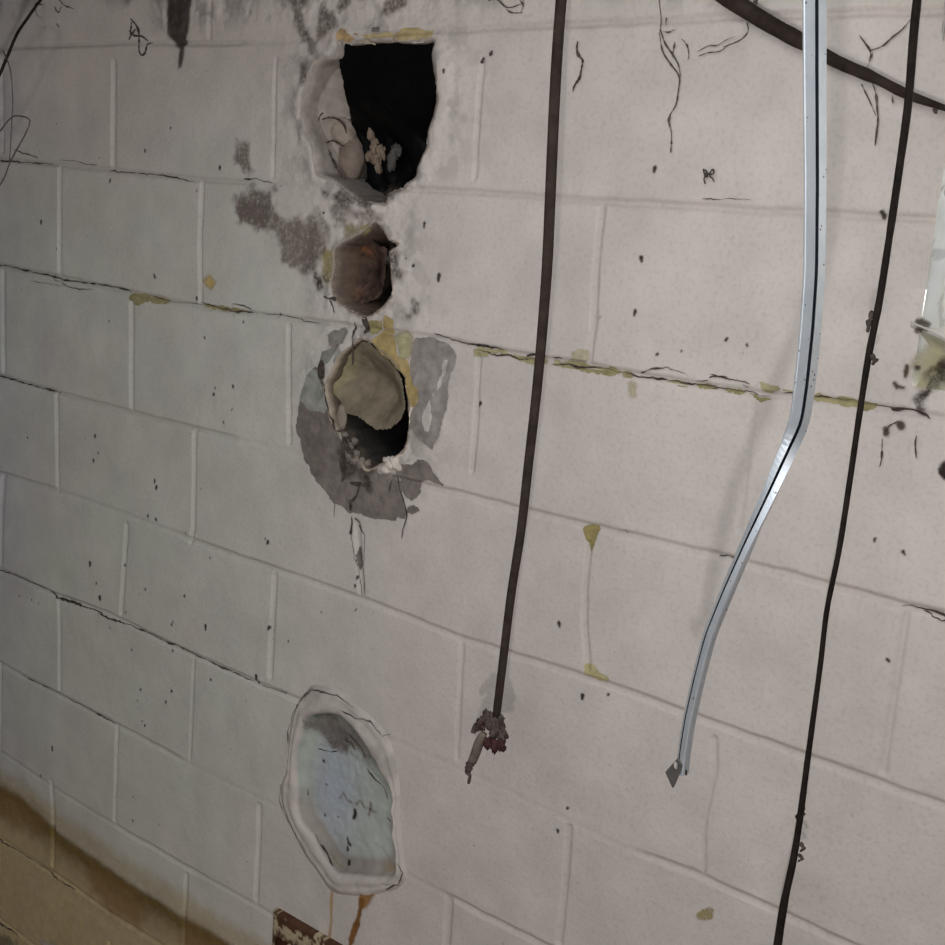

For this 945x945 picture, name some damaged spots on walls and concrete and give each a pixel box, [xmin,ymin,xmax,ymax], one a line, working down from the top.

spalling [300,27,439,207]
spalling [296,220,456,521]
crack [434,333,930,419]
crack [0,570,286,694]
crack [902,605,945,622]
water stain [0,789,227,945]
corrosion [349,894,373,945]
water stain [697,908,713,920]